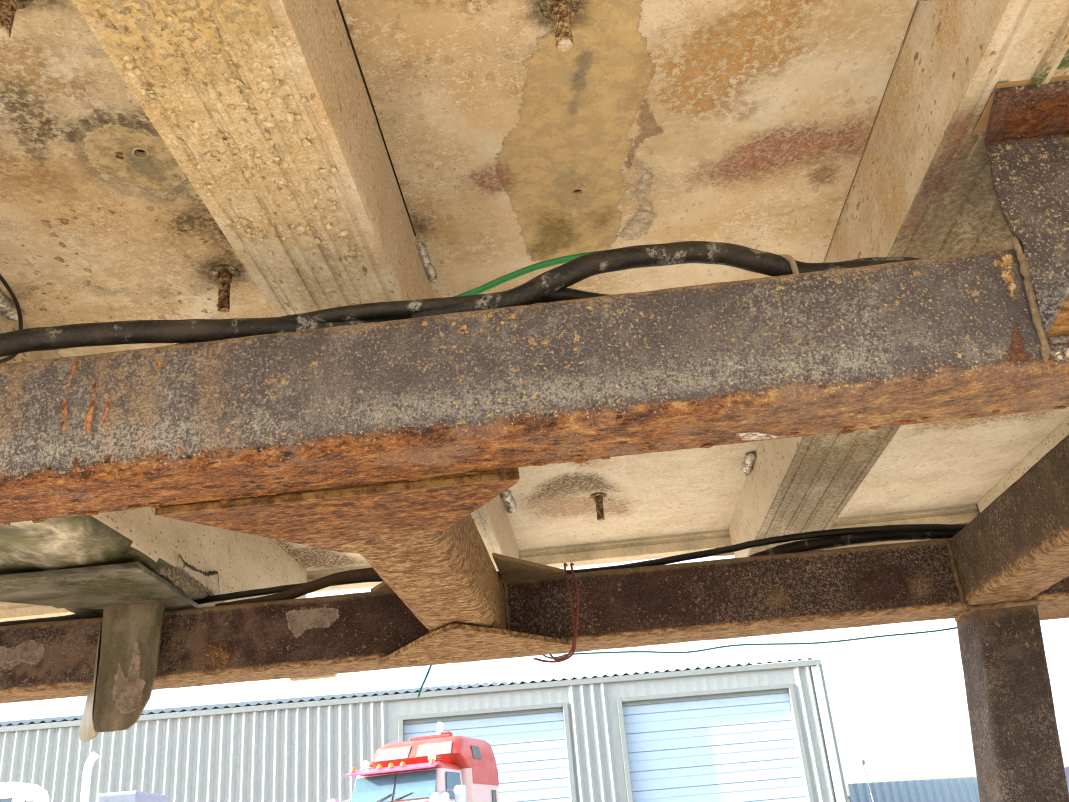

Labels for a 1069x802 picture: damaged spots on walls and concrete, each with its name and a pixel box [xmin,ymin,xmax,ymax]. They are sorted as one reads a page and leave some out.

corrosion [656,0,814,114]
damp [496,0,663,264]
damp [0,89,229,247]
corrosion [1000,254,1017,298]
corrosion [451,313,516,338]
corrosion [84,383,111,434]
damp [526,474,628,517]
peeling [286,607,339,638]
peeling [0,640,44,670]
peeling [112,641,146,714]